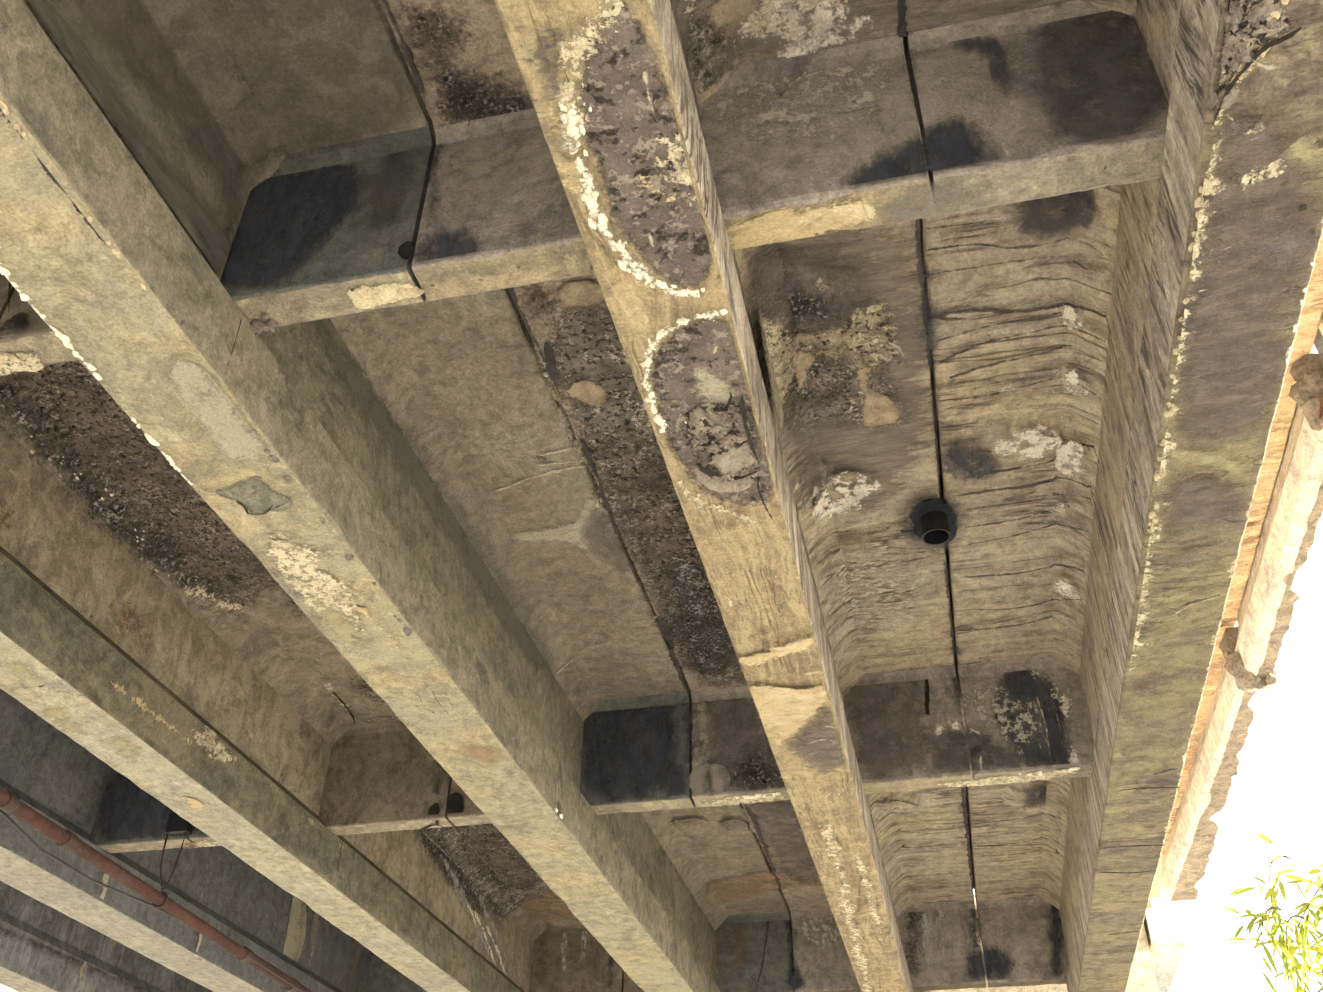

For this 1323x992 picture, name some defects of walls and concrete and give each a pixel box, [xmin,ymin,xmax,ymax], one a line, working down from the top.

water stain [684,0,888,142]
water stain [952,36,1012,93]
water stain [1031,10,1185,175]
water stain [852,118,1001,185]
spalling [37,156,121,259]
water stain [535,0,774,527]
water stain [757,191,1120,448]
peeling [854,366,903,428]
spalling [1288,353,1323,431]
spalling [216,429,293,515]
spalling [683,392,772,519]
spalling [184,583,244,612]